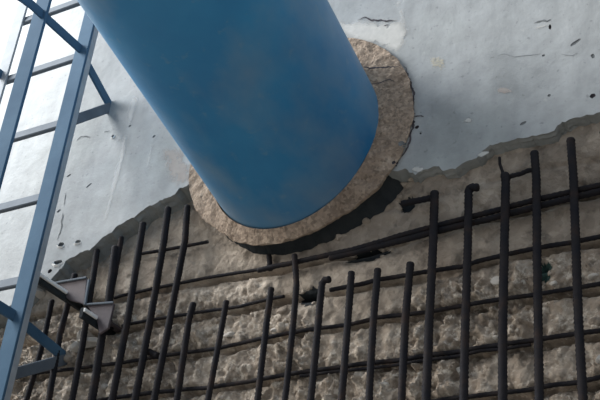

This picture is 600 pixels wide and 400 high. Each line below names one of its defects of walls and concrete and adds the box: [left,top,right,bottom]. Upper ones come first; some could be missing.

spalling [0,314,8,348]
spalling [10,112,600,400]